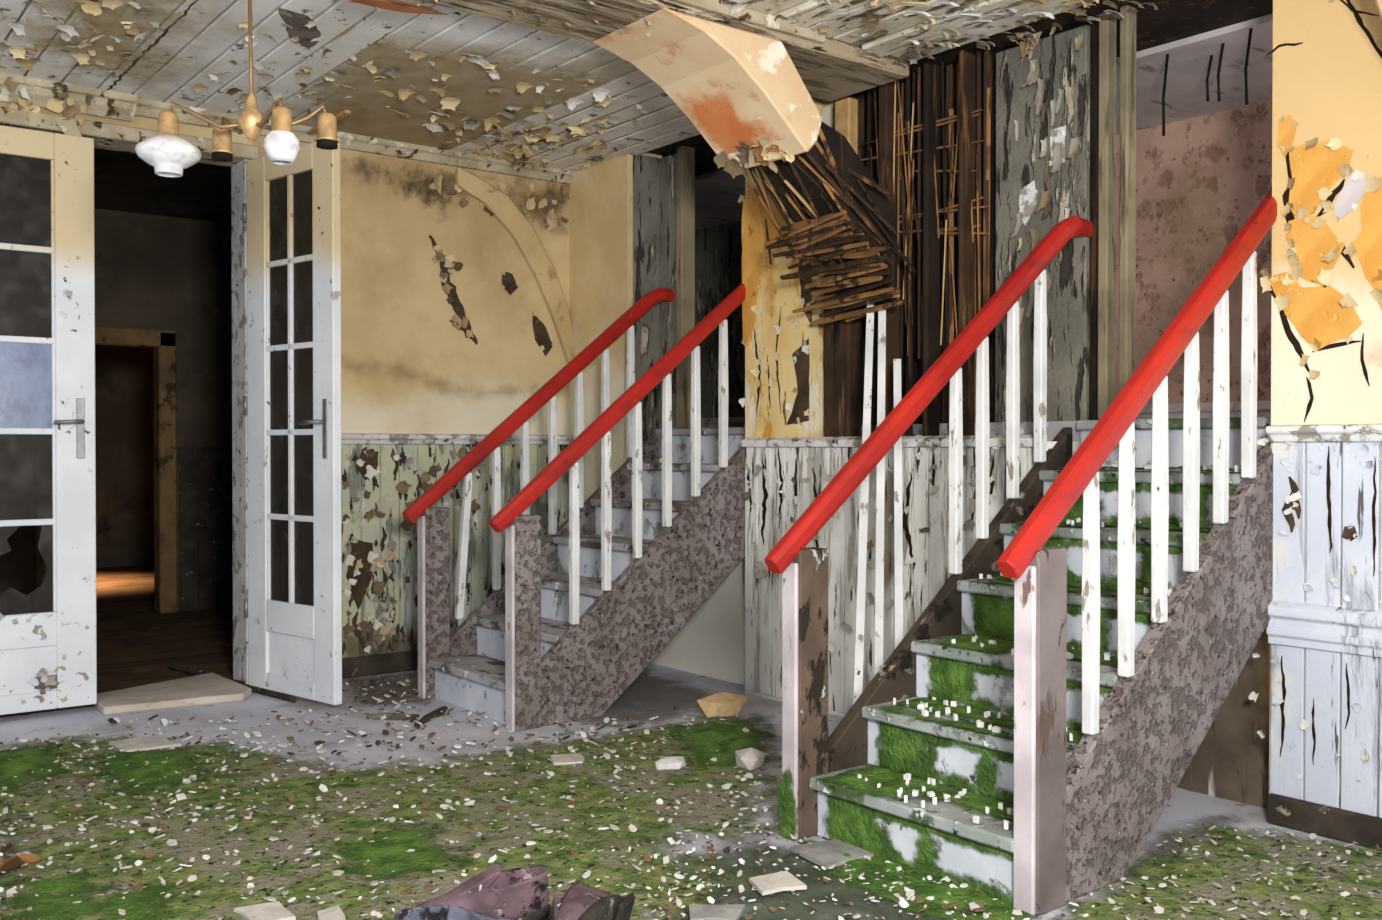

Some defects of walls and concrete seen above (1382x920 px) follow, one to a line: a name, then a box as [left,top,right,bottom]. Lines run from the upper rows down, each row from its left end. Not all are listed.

peeling [0,0,160,142]
peeling [348,0,457,15]
crack [1266,42,1303,56]
crack [1329,0,1382,58]
peeling [192,8,648,230]
peeling [817,0,1158,256]
peeling [500,269,519,295]
peeling [531,310,555,357]
spalling [1257,437,1382,536]
peeling [341,448,467,653]
peeling [1342,524,1360,544]
peeling [29,666,89,703]